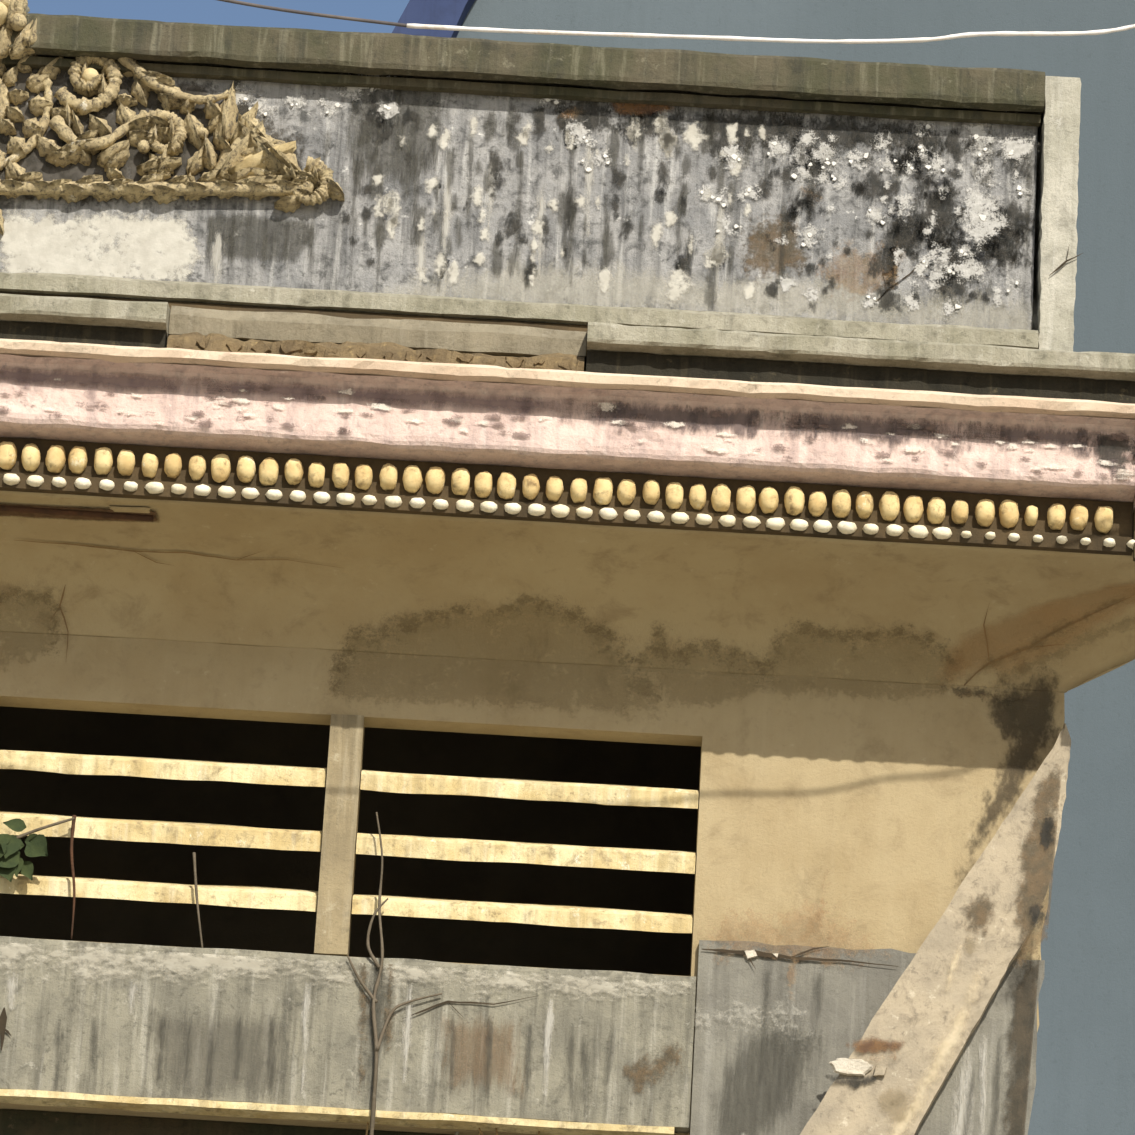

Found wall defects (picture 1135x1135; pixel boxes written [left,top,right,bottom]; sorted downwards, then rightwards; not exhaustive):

leakage [515,100,684,204]
leakage [488,199,552,257]
leakage [611,168,633,239]
leakage [703,110,1038,315]
leakage [0,369,179,391]
leakage [205,380,554,411]
leakage [570,401,778,436]
leakage [790,414,958,451]
leakage [968,424,1135,476]
leakage [953,679,1057,845]
leakage [0,943,271,978]
leakage [1004,764,1061,1135]